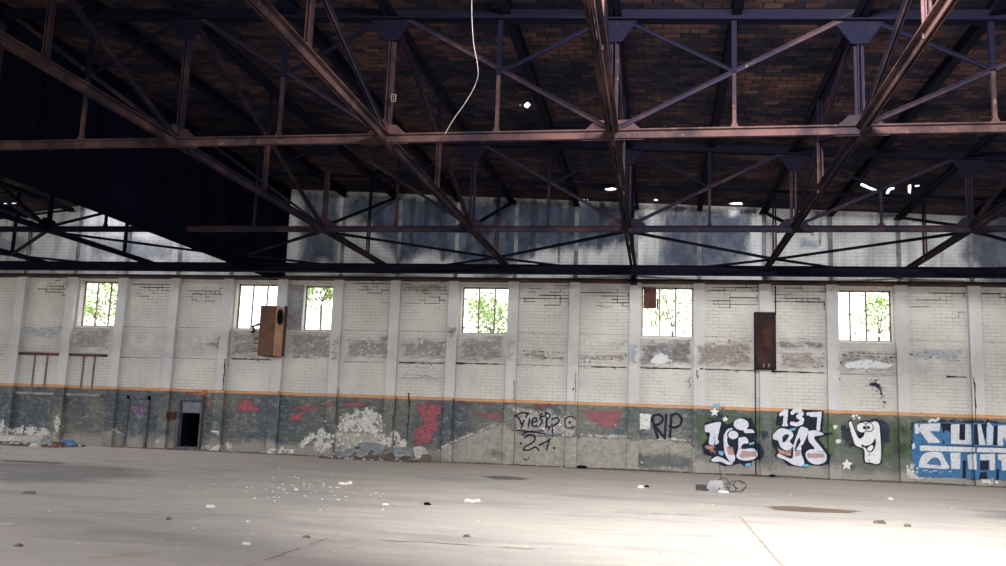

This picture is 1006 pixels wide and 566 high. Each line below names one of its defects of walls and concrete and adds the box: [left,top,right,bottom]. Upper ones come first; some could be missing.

leakage [300,193,644,264]
leakage [661,207,755,265]
leakage [962,217,1006,267]
peeling [0,414,65,439]
peeling [266,407,408,454]
crack [738,516,783,566]